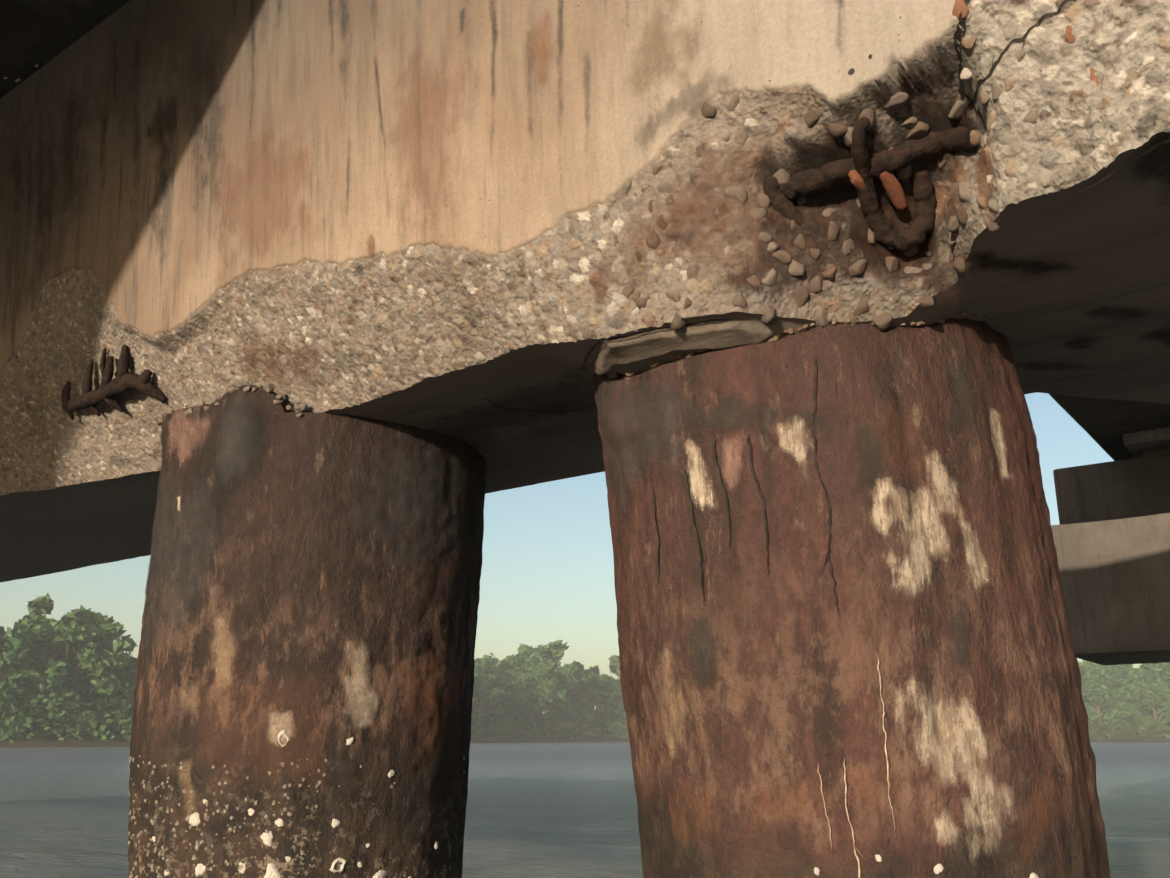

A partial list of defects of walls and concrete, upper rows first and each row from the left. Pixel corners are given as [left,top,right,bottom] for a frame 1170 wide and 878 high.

spalling [0,0,1170,496]
corrosion [760,128,852,178]
corrosion [728,149,1063,291]
corrosion [841,60,977,154]
crack [953,0,1074,154]
crack [685,470,705,600]
damp [688,443,713,506]
crack [747,436,769,574]
crack [812,357,840,618]
damp [873,458,984,593]
damp [990,411,1008,477]
damp [922,702,985,776]